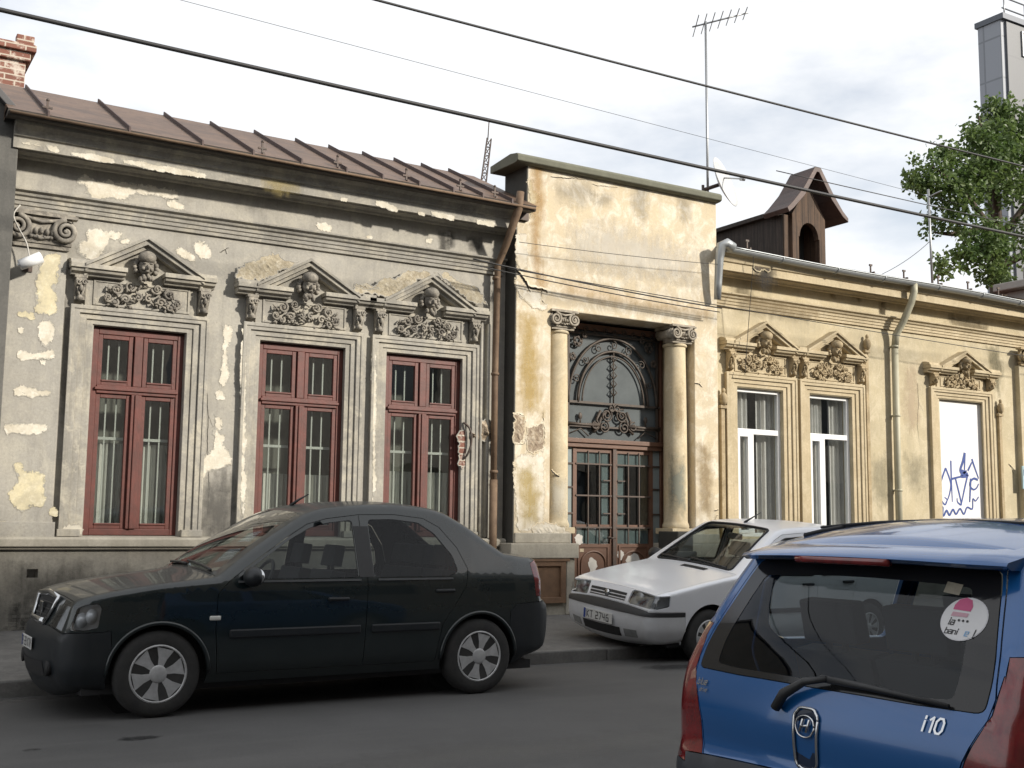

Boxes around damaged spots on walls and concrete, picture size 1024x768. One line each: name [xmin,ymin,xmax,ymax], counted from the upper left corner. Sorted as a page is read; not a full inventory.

peeling [22,142,207,178]
peeling [77,173,186,211]
peeling [75,226,130,260]
peeling [175,240,212,261]
flaking render [235,252,299,282]
peeling [17,252,61,365]
peeling [13,385,52,399]
peeling [3,422,49,436]
peeling [203,324,247,520]
peeling [512,414,571,534]
peeling [0,461,84,537]